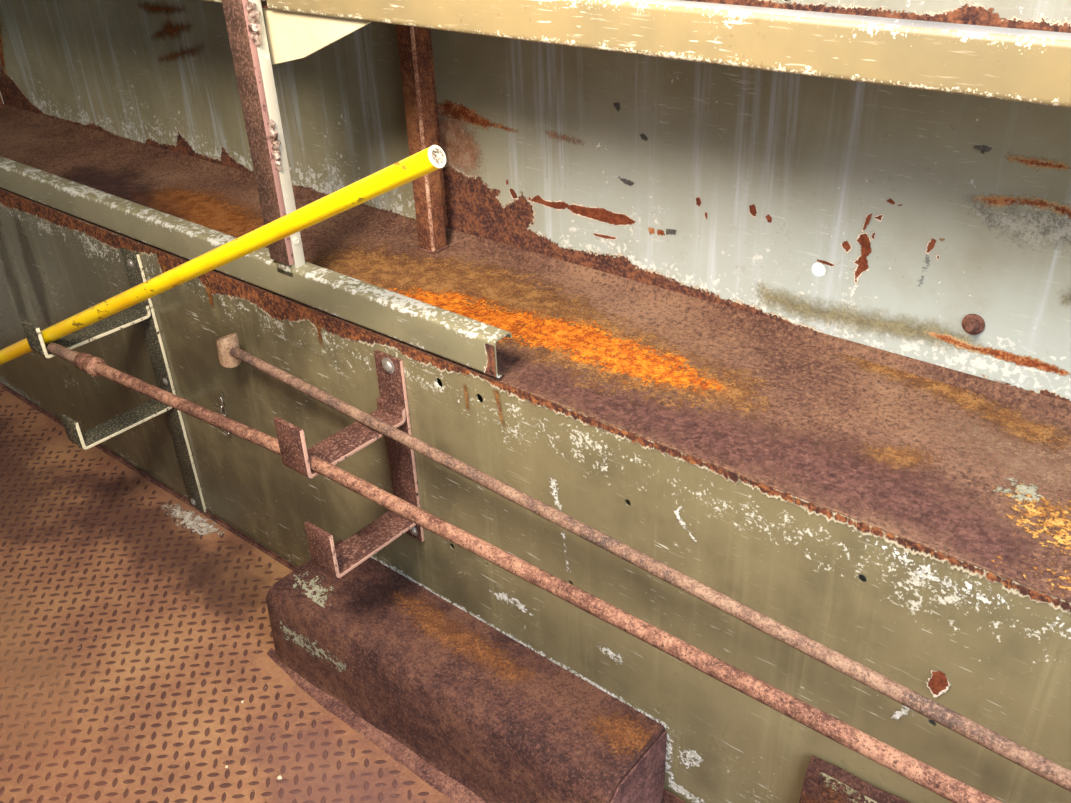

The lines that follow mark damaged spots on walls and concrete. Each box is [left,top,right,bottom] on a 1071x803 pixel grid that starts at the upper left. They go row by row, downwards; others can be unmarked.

corrosion [683,0,1071,33]
corrosion [0,23,254,174]
corrosion [1004,153,1071,171]
corrosion [0,190,186,273]
corrosion [437,99,824,333]
peeling [967,195,1071,249]
peeling [980,374,1071,402]
corrosion [198,241,1071,614]
peeling [866,539,1014,609]
peeling [926,670,951,698]
corrosion [589,714,654,760]
peeling [891,706,914,722]